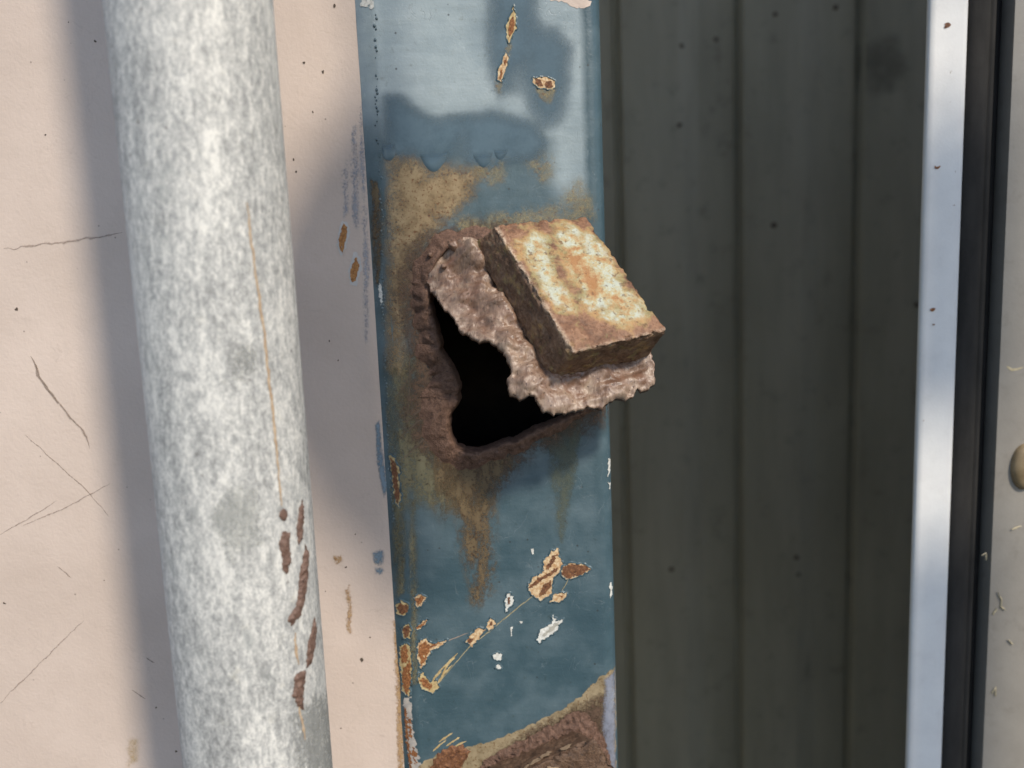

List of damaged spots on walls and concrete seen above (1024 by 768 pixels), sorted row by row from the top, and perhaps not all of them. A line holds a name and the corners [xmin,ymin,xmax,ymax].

peeling [496,4,519,84]
peeling [531,75,557,91]
corrosion [370,158,499,376]
corrosion [246,202,317,738]
corrosion [433,458,515,605]
peeling [526,546,593,645]
corrosion [430,744,471,768]
peeling [394,591,617,768]
corrosion [515,696,606,742]